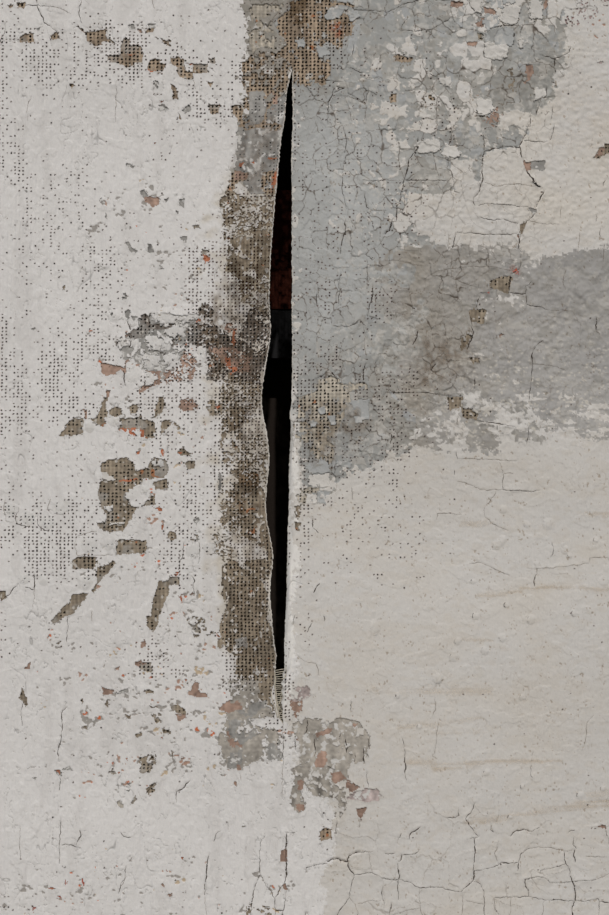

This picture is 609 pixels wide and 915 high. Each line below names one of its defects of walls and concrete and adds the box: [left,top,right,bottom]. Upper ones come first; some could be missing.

peeling [20,27,41,43]
crack [353,0,519,77]
peeling [450,0,548,60]
peeling [476,98,494,116]
peeling [416,139,461,159]
peeling [523,160,546,171]
crack [315,48,571,385]
peeling [489,276,513,294]
peeling [446,393,478,420]
crack [282,720,369,791]
peeling [287,685,382,820]
crack [251,805,609,915]